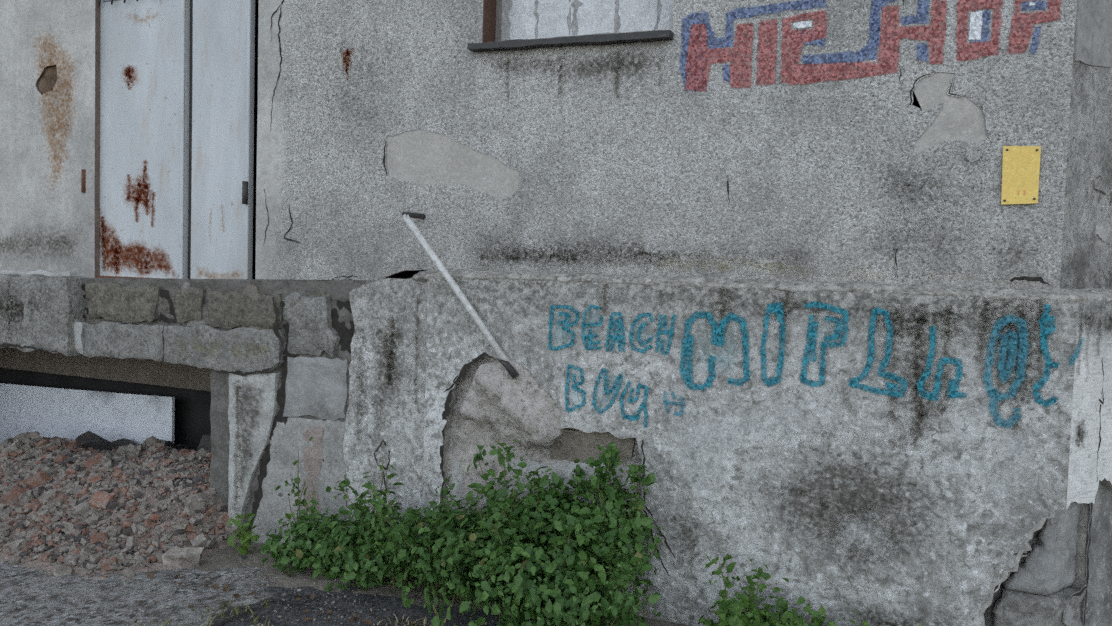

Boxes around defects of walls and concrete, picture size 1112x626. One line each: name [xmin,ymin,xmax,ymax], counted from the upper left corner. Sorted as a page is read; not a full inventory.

peeling [908,70,995,162]
corrosion [99,216,173,274]
corrosion [127,161,154,226]
spalling [444,353,645,531]
crack [1069,357,1105,626]
flaking render [979,509,1069,626]